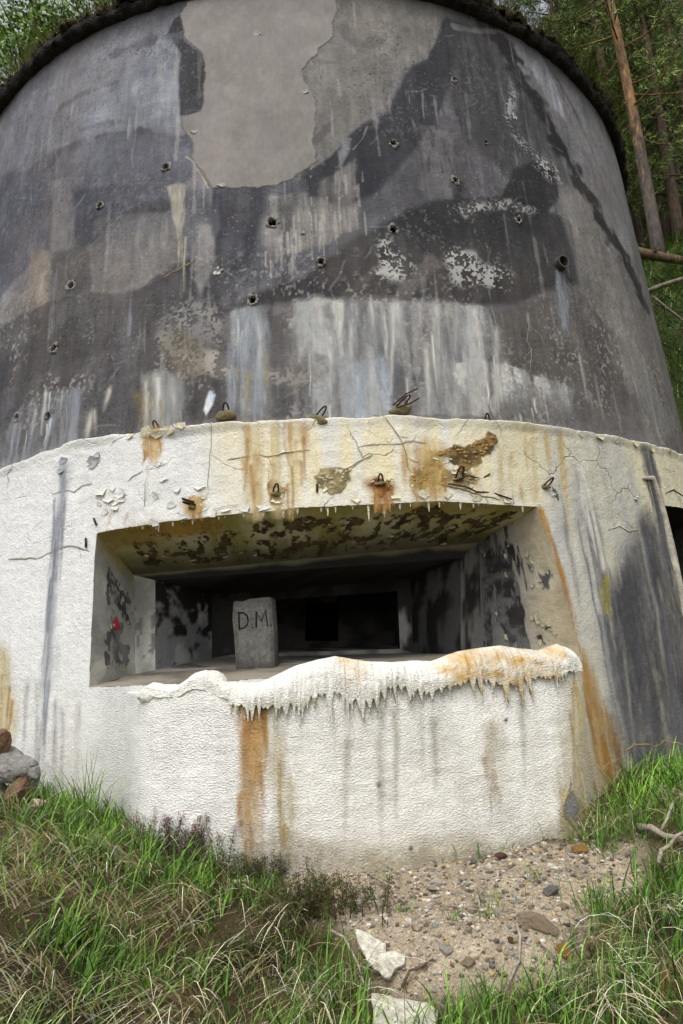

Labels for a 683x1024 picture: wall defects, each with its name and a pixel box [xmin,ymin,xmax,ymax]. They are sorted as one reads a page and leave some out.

peeling [180,0,337,188]
leakage [144,298,417,428]
leakage [423,305,570,422]
leakage [47,474,65,618]
flaking render [94,484,125,516]
corrosion [243,427,306,514]
peeling [124,431,557,649]
corrosion [556,555,569,599]
leakage [578,448,683,772]
corrosion [238,707,276,865]
leakage [139,644,583,731]
corrosion [572,654,616,818]